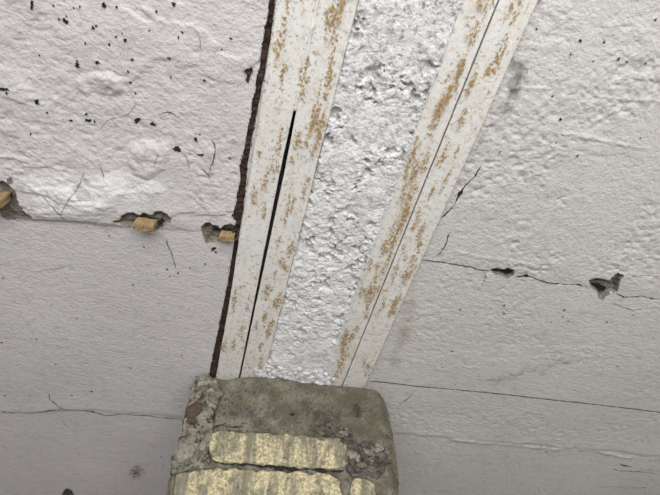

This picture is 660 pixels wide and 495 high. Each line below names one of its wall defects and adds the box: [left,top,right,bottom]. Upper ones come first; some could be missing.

rust [289,0,346,163]
rust [359,0,524,320]
spalling [0,177,32,221]
spalling [113,211,171,231]
spalling [201,222,239,253]
rust [208,0,295,378]
crack [442,167,481,217]
crack [517,274,587,287]
spalling [589,273,624,300]
rust [333,324,360,378]
crack [372,381,660,413]
crack [208,451,345,474]